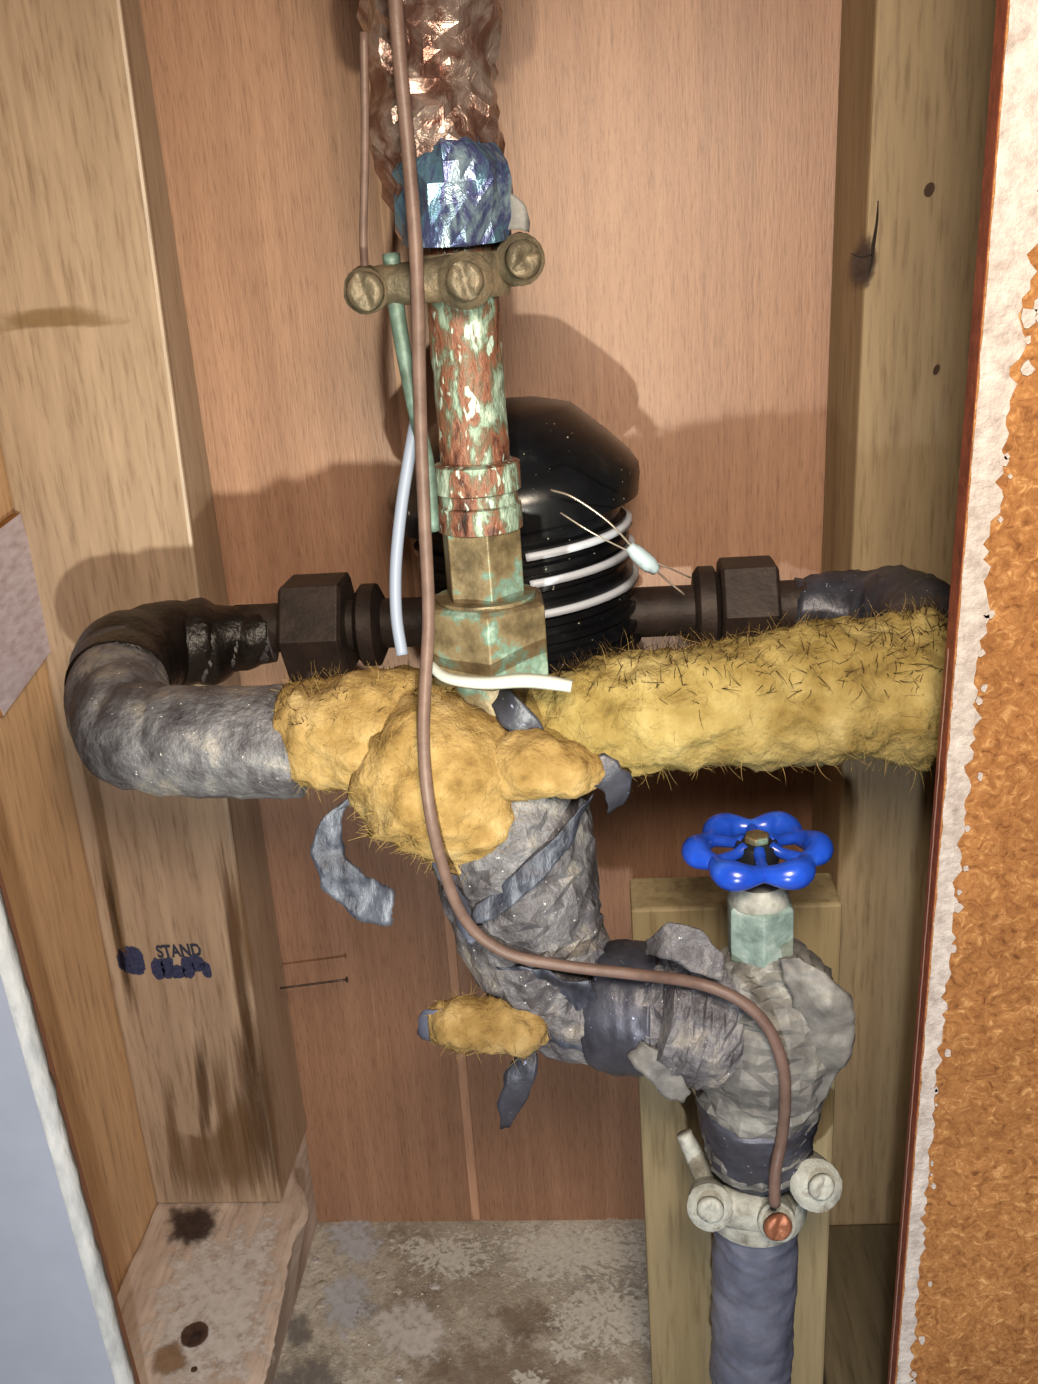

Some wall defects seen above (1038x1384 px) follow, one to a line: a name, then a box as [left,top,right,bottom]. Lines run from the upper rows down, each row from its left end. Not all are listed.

damp [167,884,278,1187]
damp [169,1207,215,1244]
damp [154,1344,186,1374]